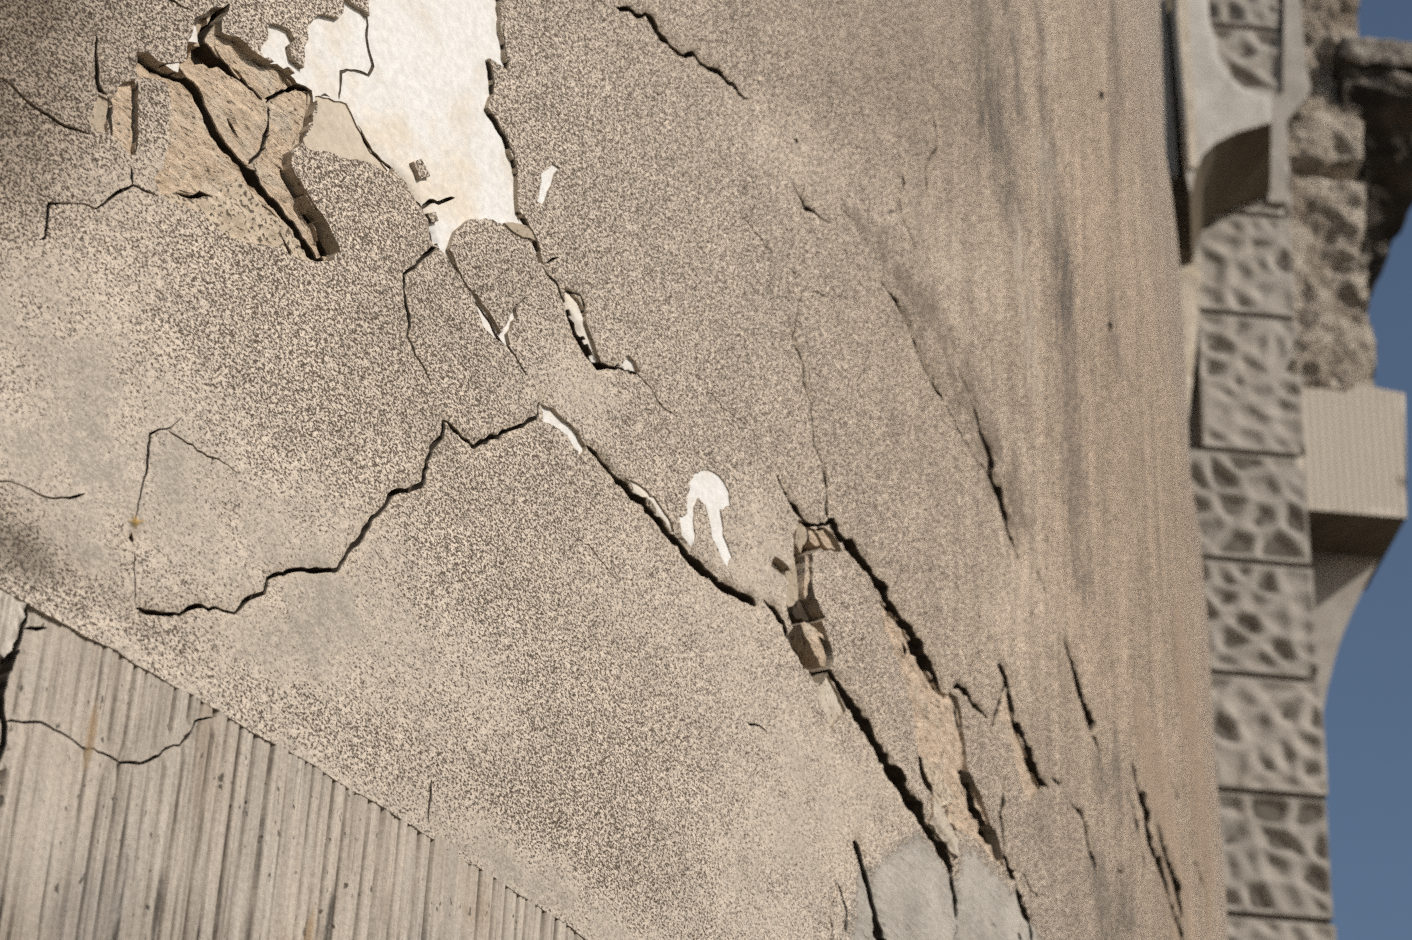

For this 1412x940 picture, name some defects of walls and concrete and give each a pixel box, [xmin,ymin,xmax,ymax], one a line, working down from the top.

peeling [89,0,537,265]
crack [484,44,517,177]
crack [616,6,746,99]
crack [403,197,664,409]
crack [0,608,209,765]
crack [136,403,538,617]
peeling [627,470,731,567]
crack [586,446,786,636]
flaking render [771,522,843,726]
flaking render [881,606,1001,865]
crack [783,474,1201,940]
flaking render [1001,695,1038,799]